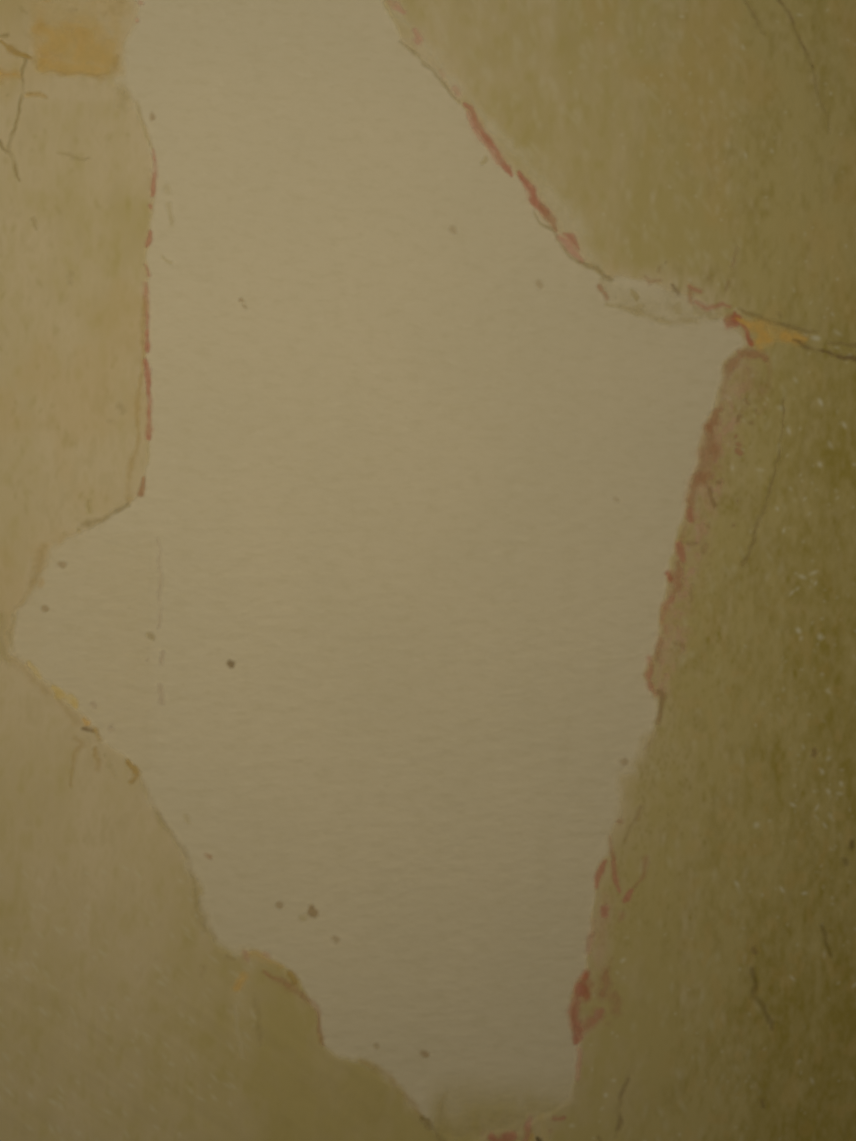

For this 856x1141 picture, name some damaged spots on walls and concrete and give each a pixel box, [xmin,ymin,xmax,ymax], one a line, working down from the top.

crack [0,34,31,181]
crack [739,309,856,361]
peeling [10,501,165,786]
peeling [116,0,744,1123]